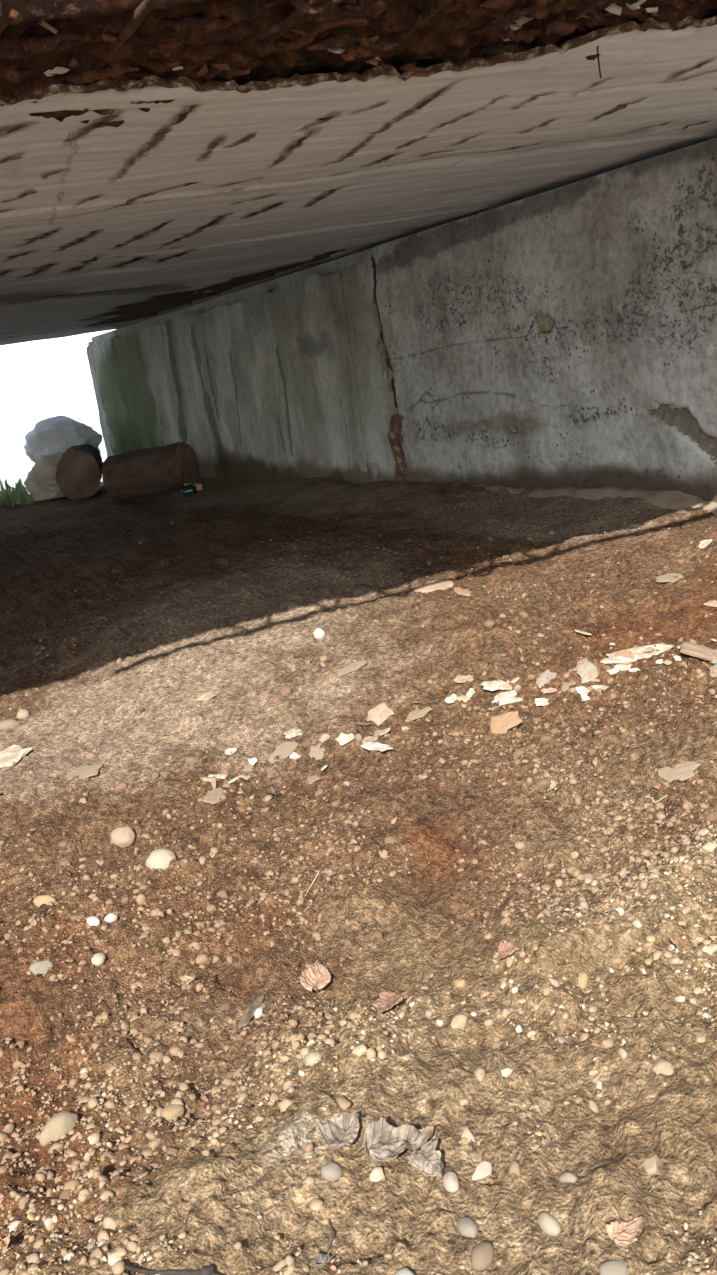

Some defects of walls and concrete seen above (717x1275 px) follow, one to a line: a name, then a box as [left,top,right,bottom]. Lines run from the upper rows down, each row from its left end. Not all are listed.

spalling [0,0,717,127]
crack [371,256,405,458]
spalling [645,399,717,466]